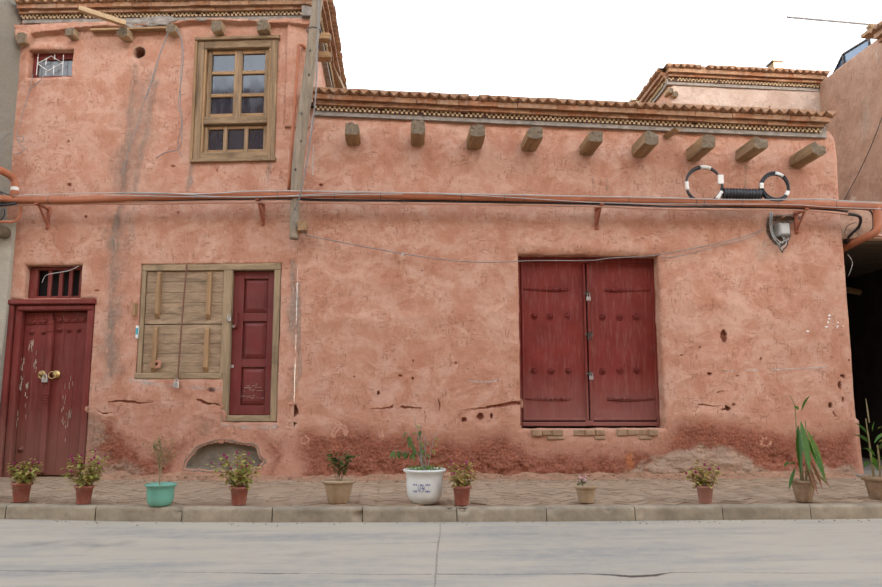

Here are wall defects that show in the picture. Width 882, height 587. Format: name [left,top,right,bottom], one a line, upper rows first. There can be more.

crack [85,59,155,436]
crack [331,421,349,439]
crack [367,398,523,439]
spalling [84,404,864,480]